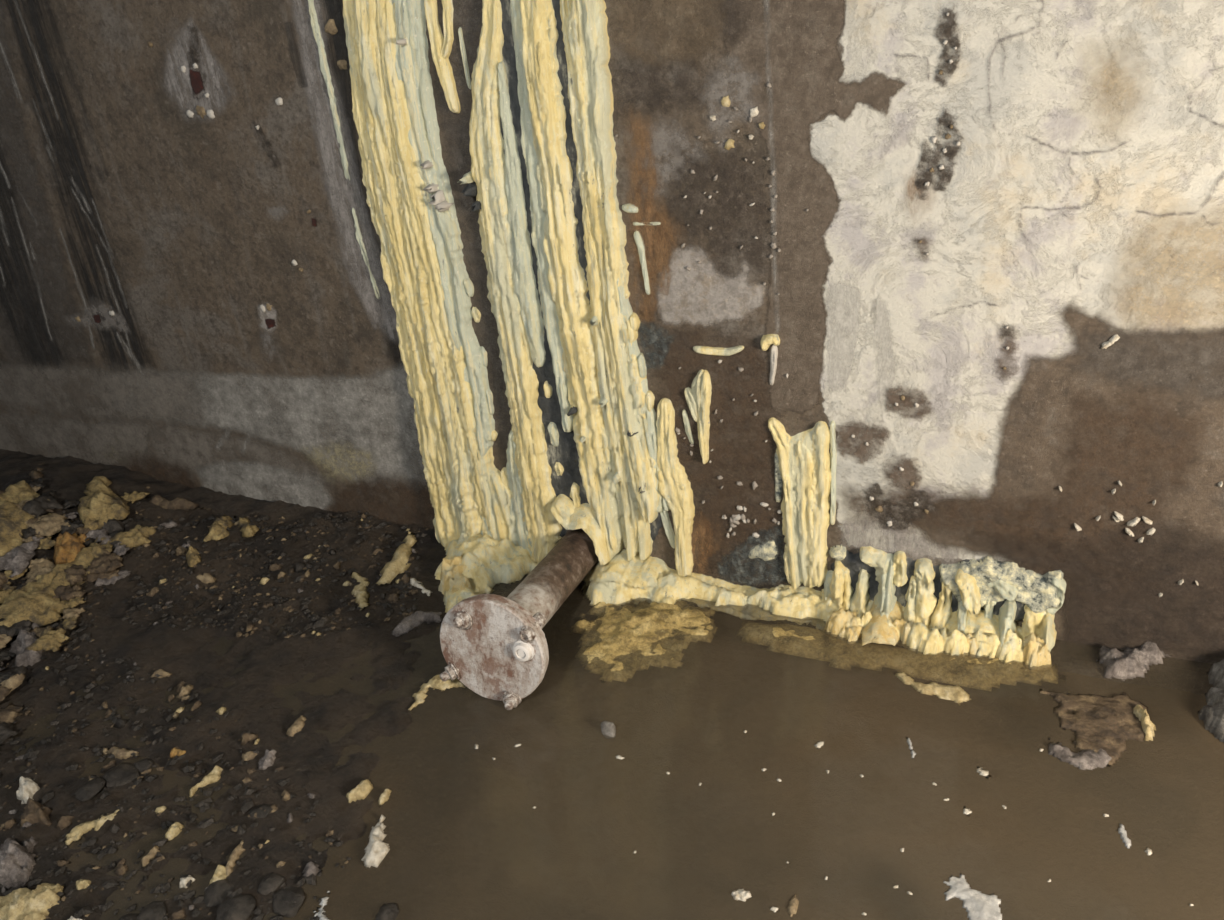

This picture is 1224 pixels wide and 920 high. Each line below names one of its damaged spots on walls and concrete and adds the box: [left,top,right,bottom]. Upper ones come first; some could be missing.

damp [0,0,1224,667]
peeling [810,0,1224,563]